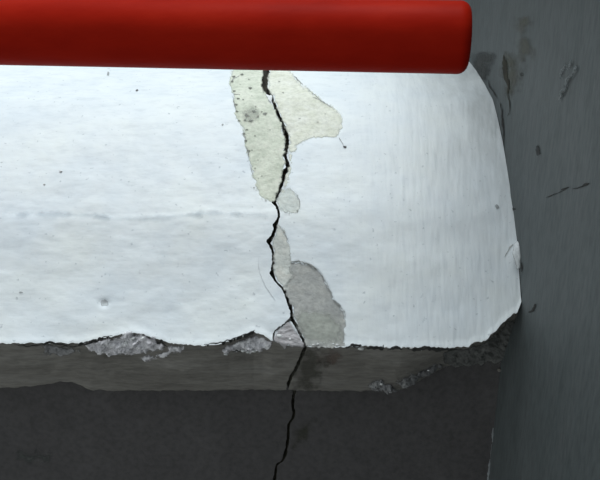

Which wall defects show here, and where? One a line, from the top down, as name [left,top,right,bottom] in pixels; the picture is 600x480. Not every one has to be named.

peeling [229,70,346,213]
flaking render [18,332,184,362]
crack [258,70,307,480]
peeling [204,225,515,395]